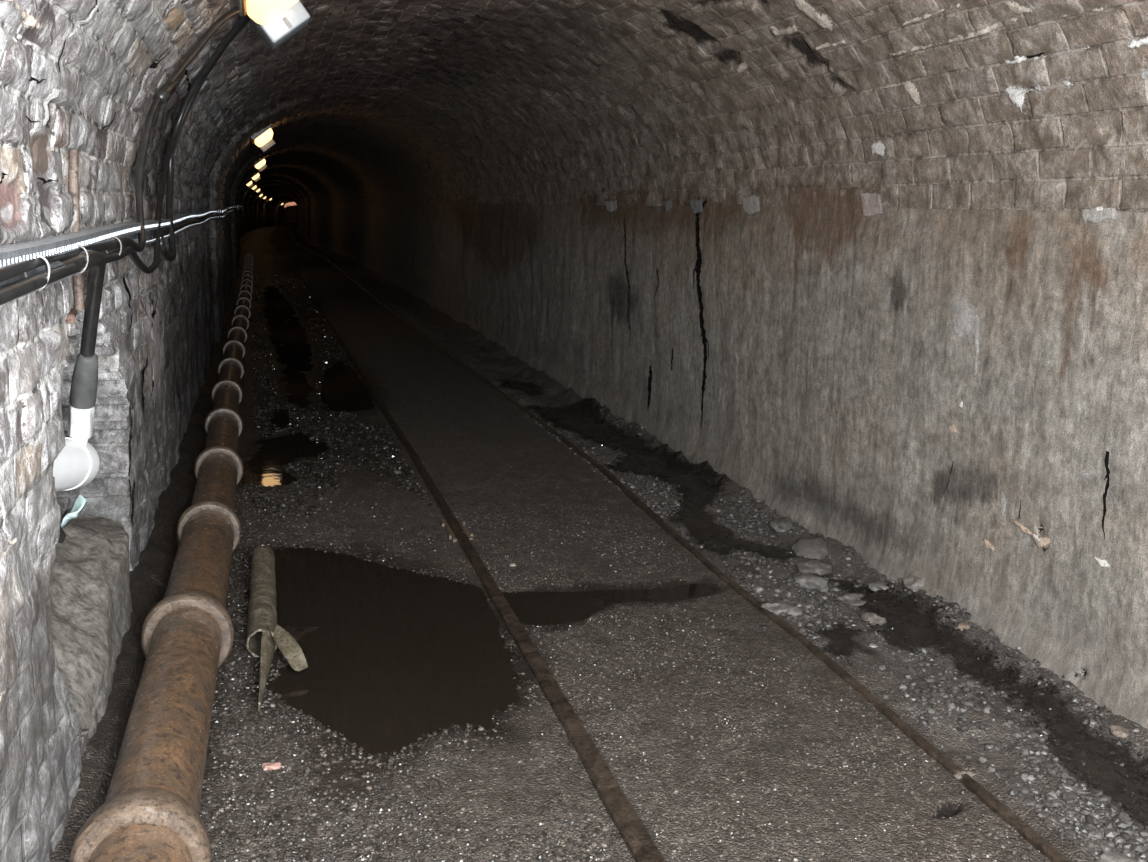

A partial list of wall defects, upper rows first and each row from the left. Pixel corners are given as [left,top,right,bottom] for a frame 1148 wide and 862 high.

spalling [660,9,715,44]
spalling [717,50,748,73]
spalling [770,0,846,66]
crack [624,213,659,345]
crack [693,197,709,428]
crack [647,348,673,411]
crack [1102,451,1110,539]